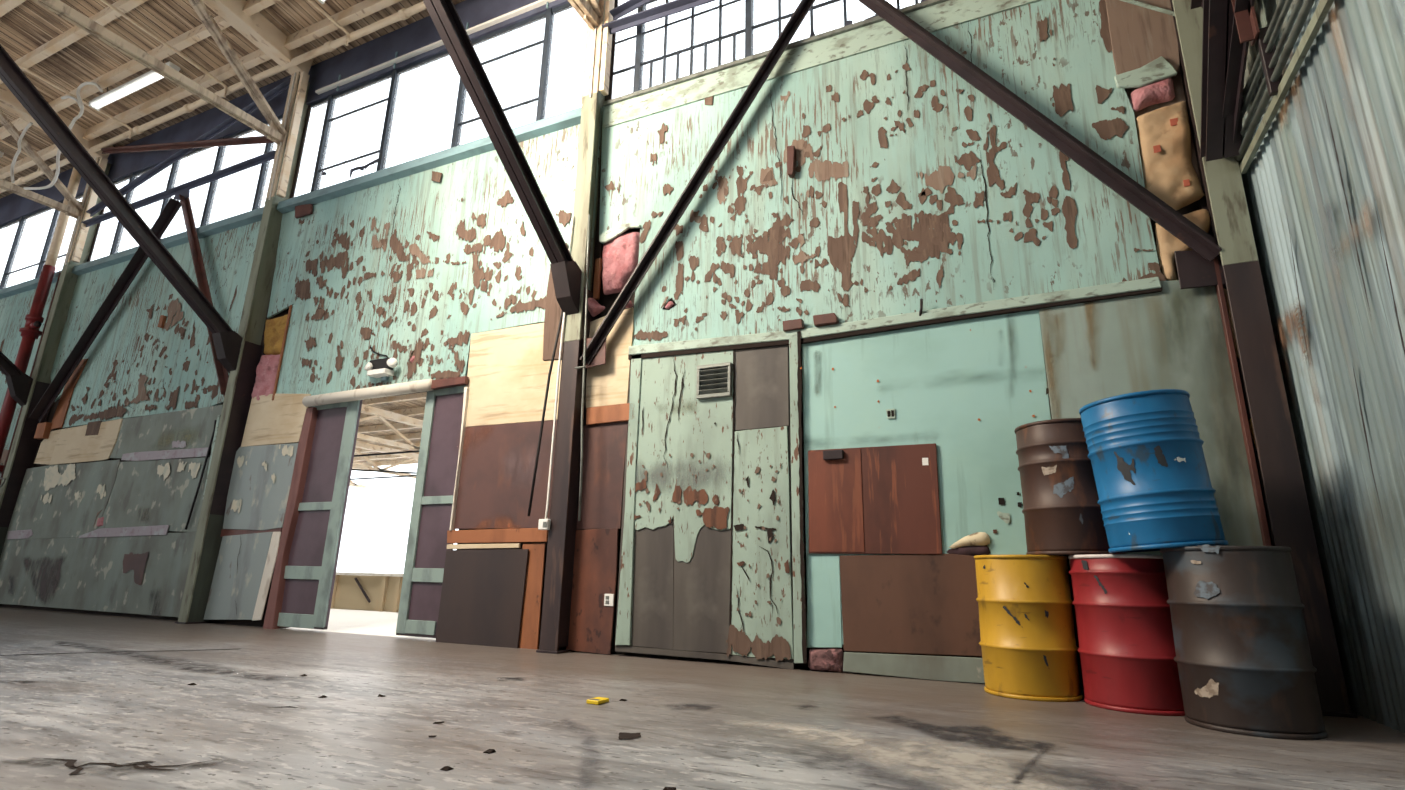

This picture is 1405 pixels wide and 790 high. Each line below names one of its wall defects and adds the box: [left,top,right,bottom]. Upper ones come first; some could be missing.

peeling [1037,17,1052,42]
peeling [1097,0,1112,53]
peeling [1092,85,1129,140]
peeling [556,210,571,227]
peeling [634,63,1077,341]
peeling [294,189,546,389]
peeling [69,294,219,427]
peeling [40,464,106,504]
peeling [157,440,200,480]
peeling [279,445,293,457]
peeling [123,552,149,585]
peeling [634,450,791,662]